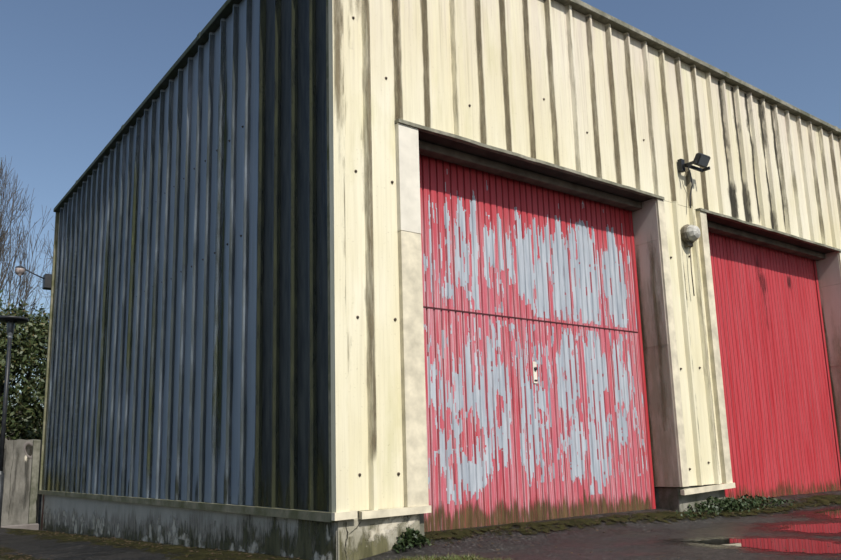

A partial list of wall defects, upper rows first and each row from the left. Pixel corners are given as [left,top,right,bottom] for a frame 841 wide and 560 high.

damp [392,0,403,120]
damp [421,0,431,128]
damp [475,0,486,144]
damp [499,0,512,151]
damp [523,0,536,159]
damp [606,33,622,184]
damp [625,50,639,180]
damp [658,51,676,201]
damp [675,58,693,206]
damp [718,81,786,229]
damp [40,0,394,560]
peeling [423,182,648,505]